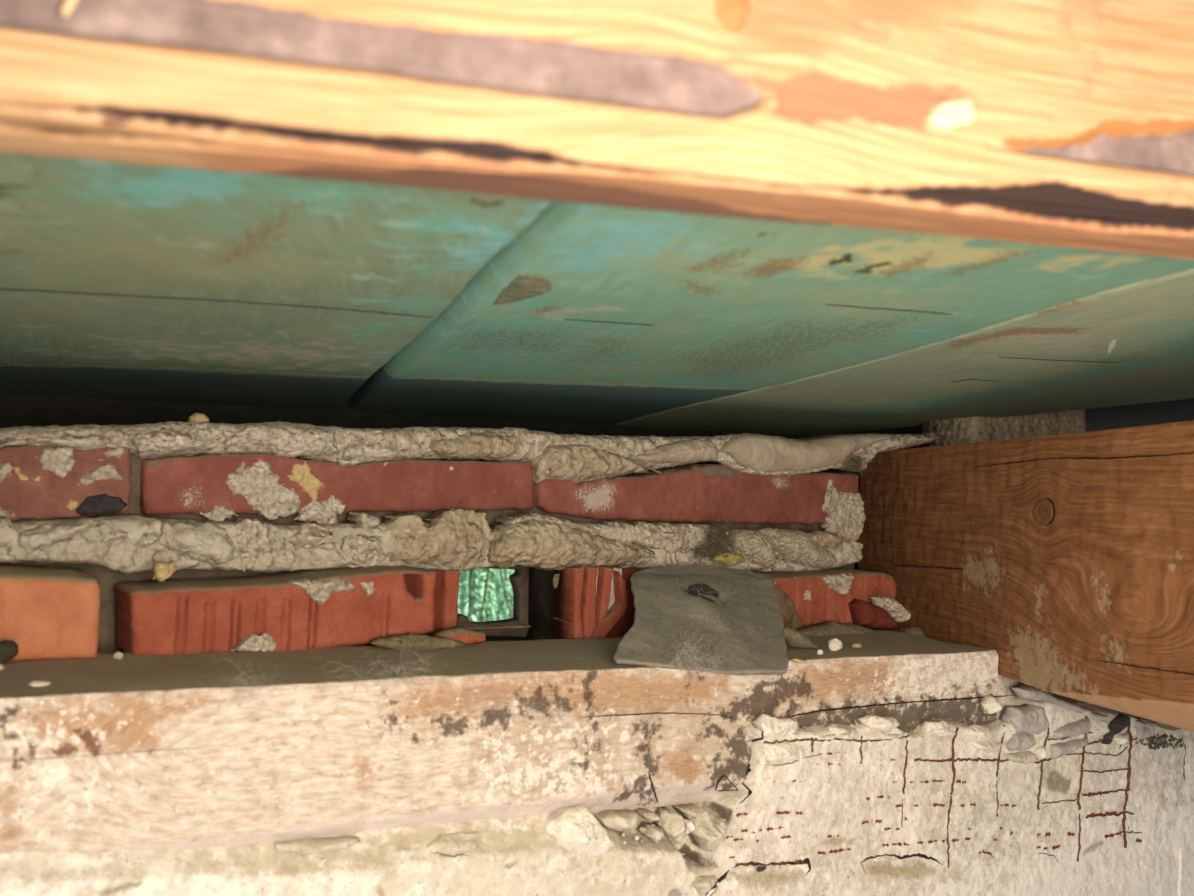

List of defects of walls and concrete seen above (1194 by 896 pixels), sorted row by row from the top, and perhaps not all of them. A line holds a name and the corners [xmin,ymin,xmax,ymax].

crack [0,288,433,318]
flaking render [707,802,732,824]
corrosion [726,811,803,843]
corrosion [862,795,972,847]
crack [705,870,729,896]
corrosion [730,856,804,867]
flaking render [735,858,811,885]
flaking render [861,853,944,879]